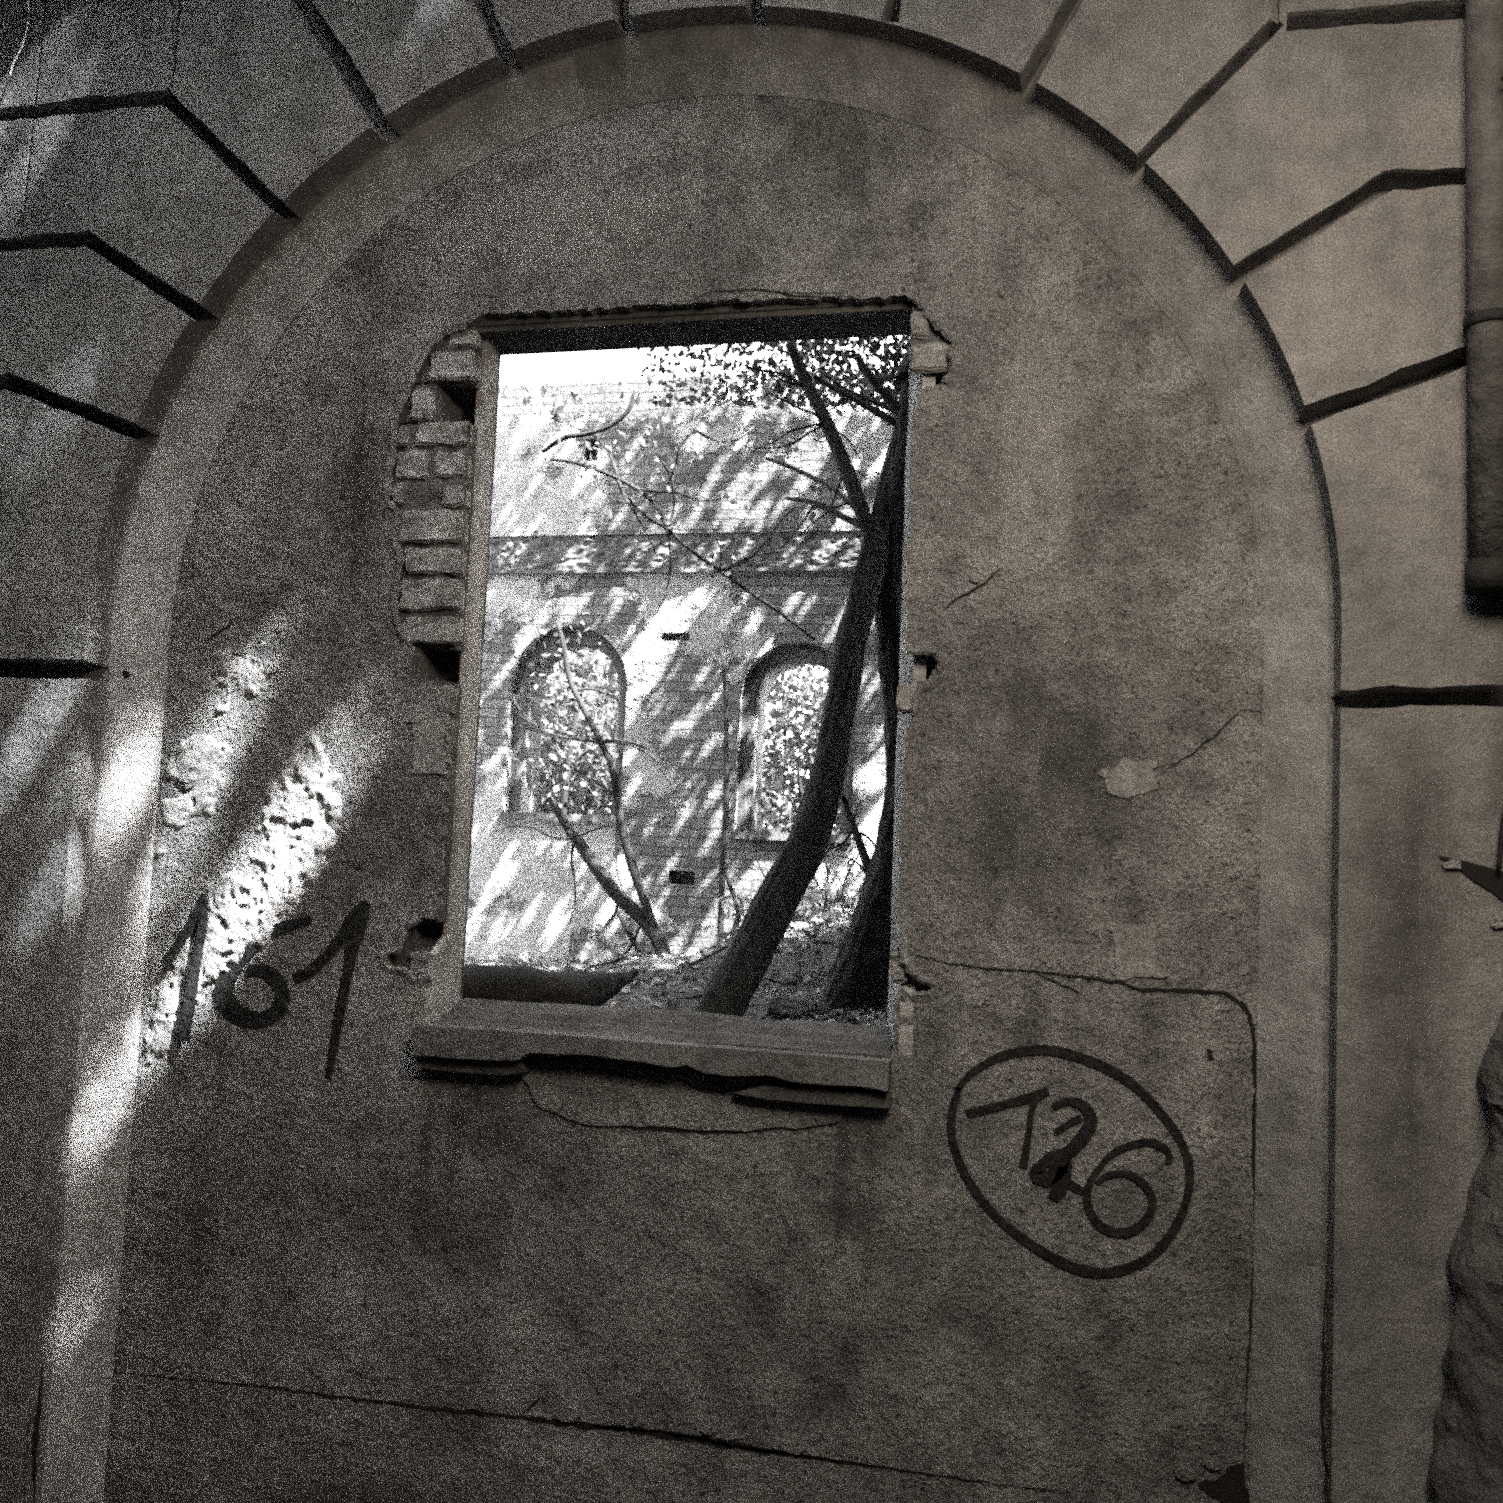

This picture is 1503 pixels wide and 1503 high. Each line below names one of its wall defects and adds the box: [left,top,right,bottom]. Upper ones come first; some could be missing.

flaking render [141,320,482,1068]